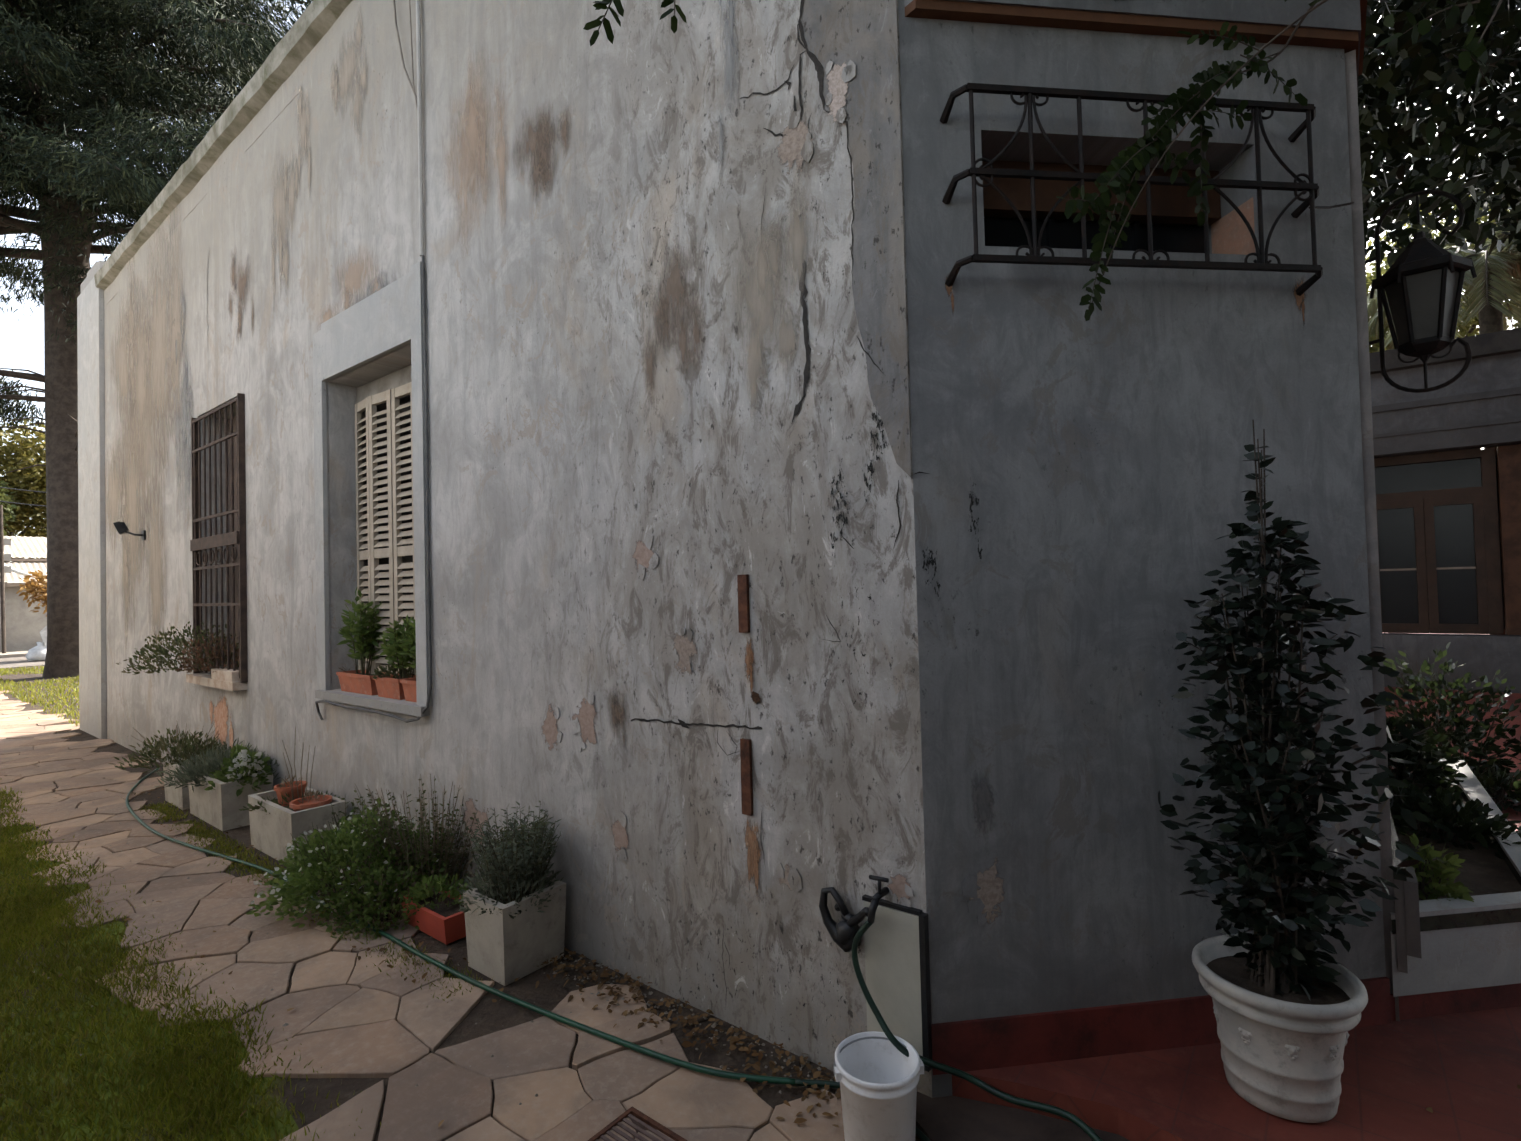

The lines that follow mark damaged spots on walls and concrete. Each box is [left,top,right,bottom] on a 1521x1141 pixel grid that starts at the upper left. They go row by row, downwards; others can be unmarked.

crack [740,0,854,282]
damp [229,259,254,335]
crack [792,260,811,423]
crack [856,335,883,373]
rust [745,639,760,704]